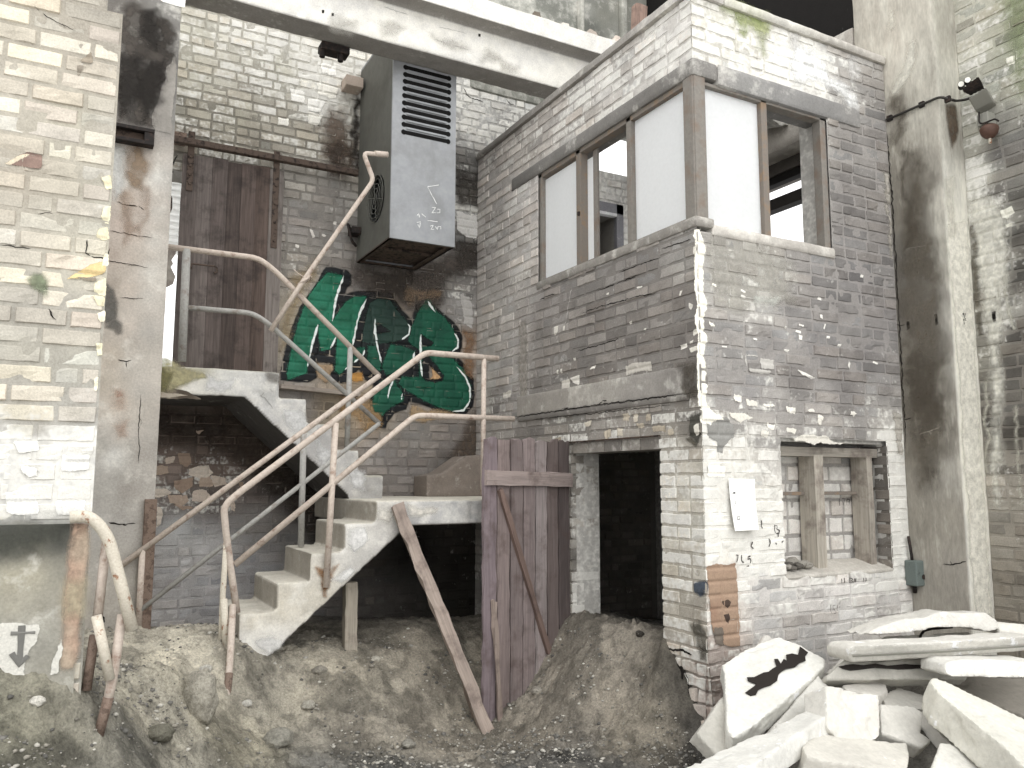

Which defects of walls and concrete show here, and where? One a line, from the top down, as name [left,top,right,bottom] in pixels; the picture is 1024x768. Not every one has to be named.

spalling [6,152,42,169]
peeling [102,175,112,190]
peeling [96,206,111,240]
peeling [68,253,109,322]
water stain [105,284,122,334]
peeling [679,229,848,445]
water stain [901,161,1015,615]
peeling [893,413,903,455]
peeling [155,453,226,527]